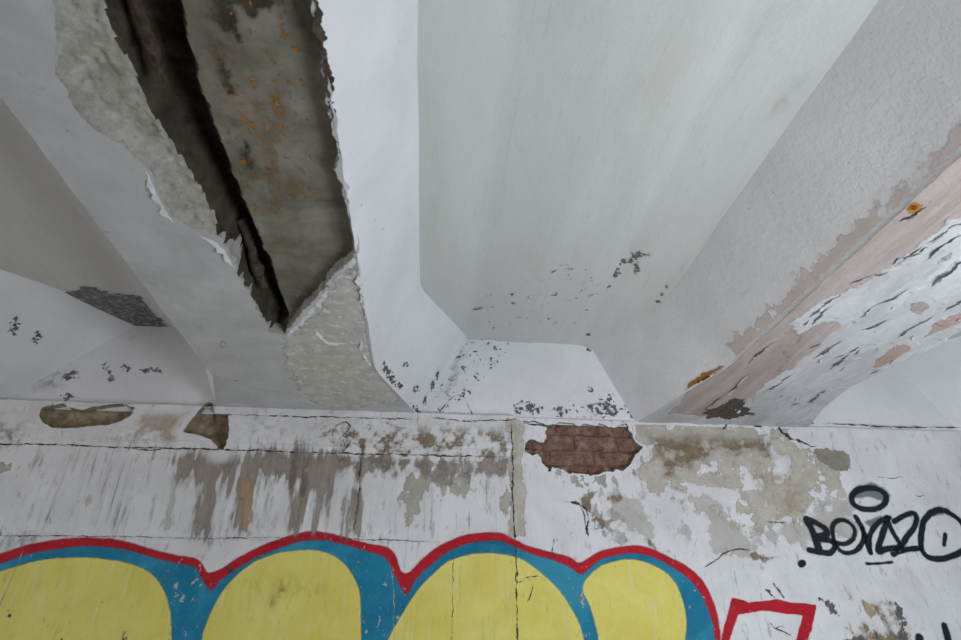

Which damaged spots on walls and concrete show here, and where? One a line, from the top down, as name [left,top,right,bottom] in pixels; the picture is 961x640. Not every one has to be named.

spalling [52,0,400,408]
rust [907,202,922,213]
peeling [487,124,961,558]
rust [688,366,723,388]
hole [39,403,134,428]
spalling [183,402,229,450]
peeling [360,455,481,527]